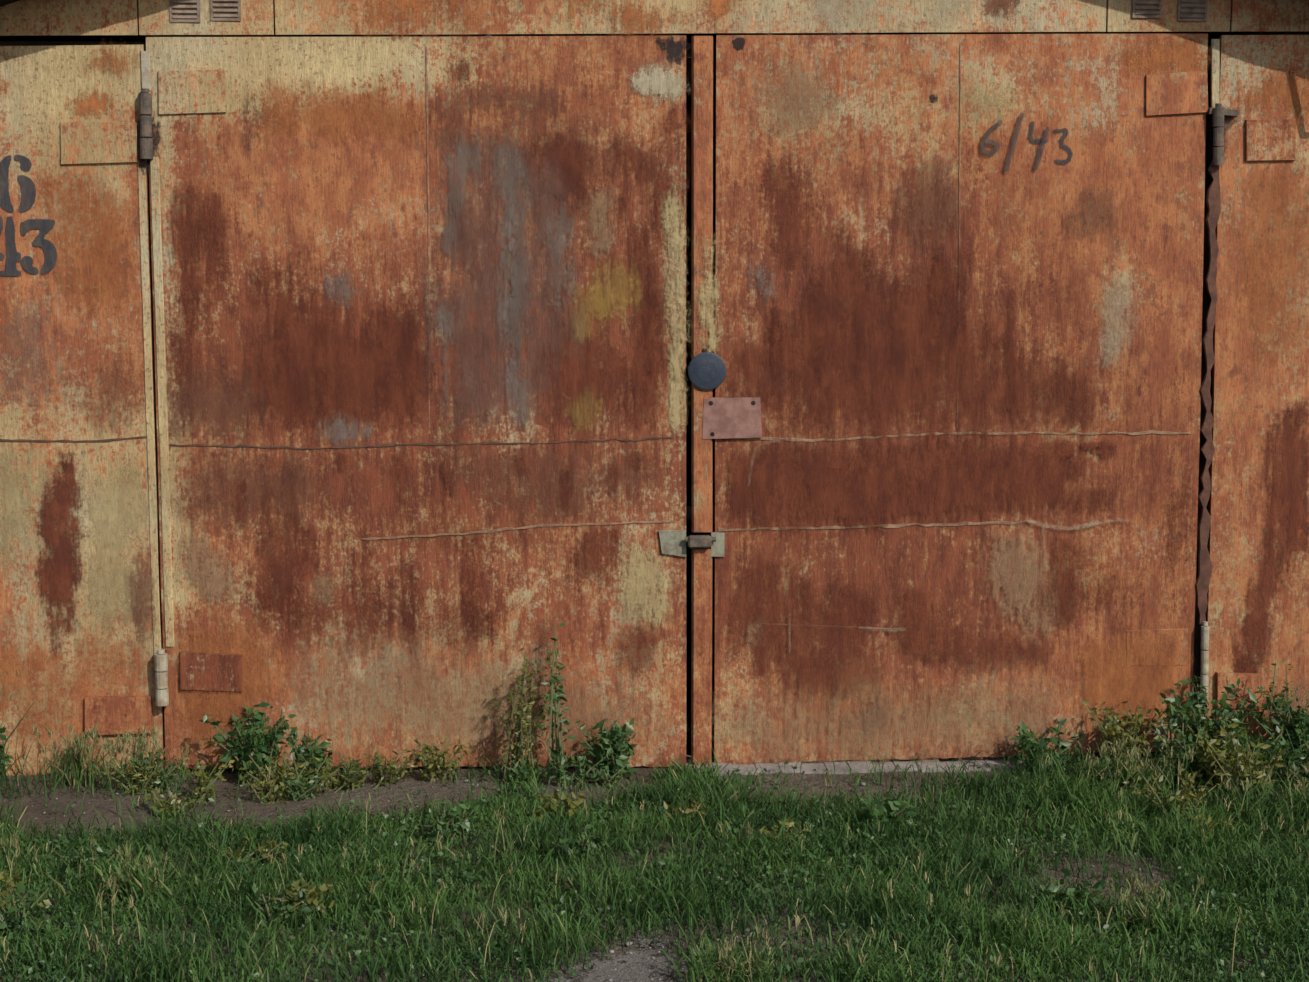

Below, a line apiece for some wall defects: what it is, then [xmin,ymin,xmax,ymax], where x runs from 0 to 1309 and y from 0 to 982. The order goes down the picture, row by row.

rust [569,0,688,64]
rust [732,37,745,50]
rust [984,0,1020,16]
rust [65,90,113,116]
rust [1238,70,1309,121]
rust [613,108,686,214]
rust [171,186,226,417]
rust [35,453,84,657]
rust [130,547,155,640]
rust [249,467,316,628]
rust [574,531,618,585]
rust [1233,402,1309,674]